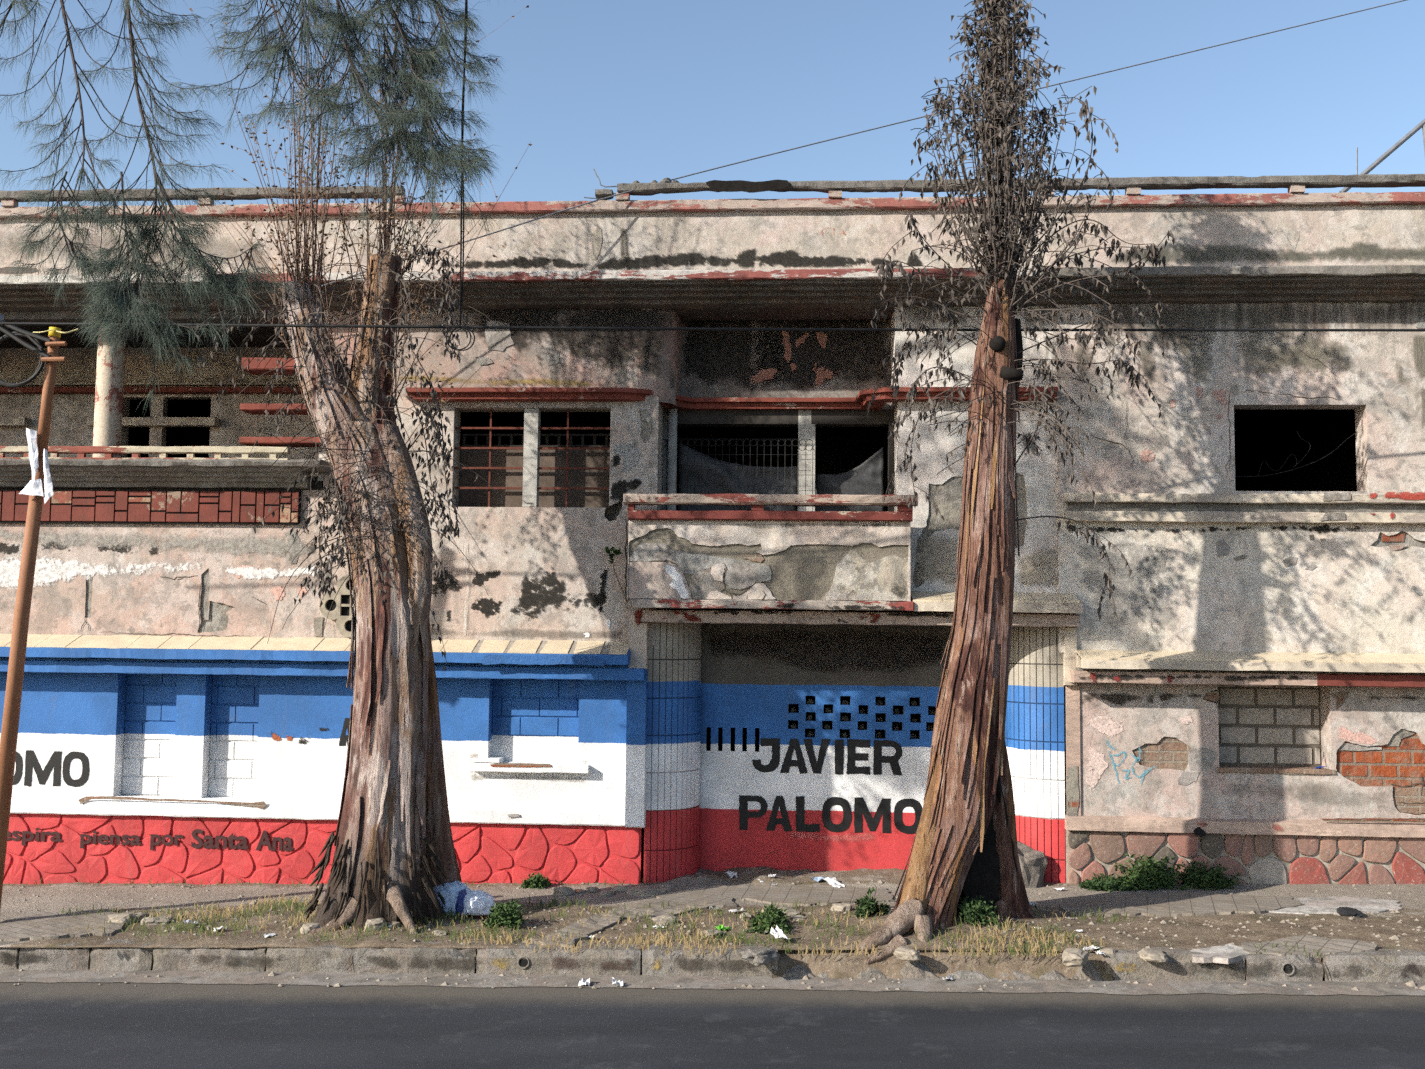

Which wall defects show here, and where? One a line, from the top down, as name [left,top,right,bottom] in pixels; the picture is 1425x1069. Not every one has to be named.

damp [440,228,921,270]
damp [755,319,891,390]
damp [1100,302,1425,380]
damp [1396,336,1425,421]
damp [0,530,314,588]
spalling [628,477,963,601]
spalling [1015,473,1027,548]
spalling [1309,492,1351,541]
spalling [1369,492,1425,551]
peeling [1066,715,1124,816]
spalling [1132,716,1217,785]
spalling [1322,727,1425,823]